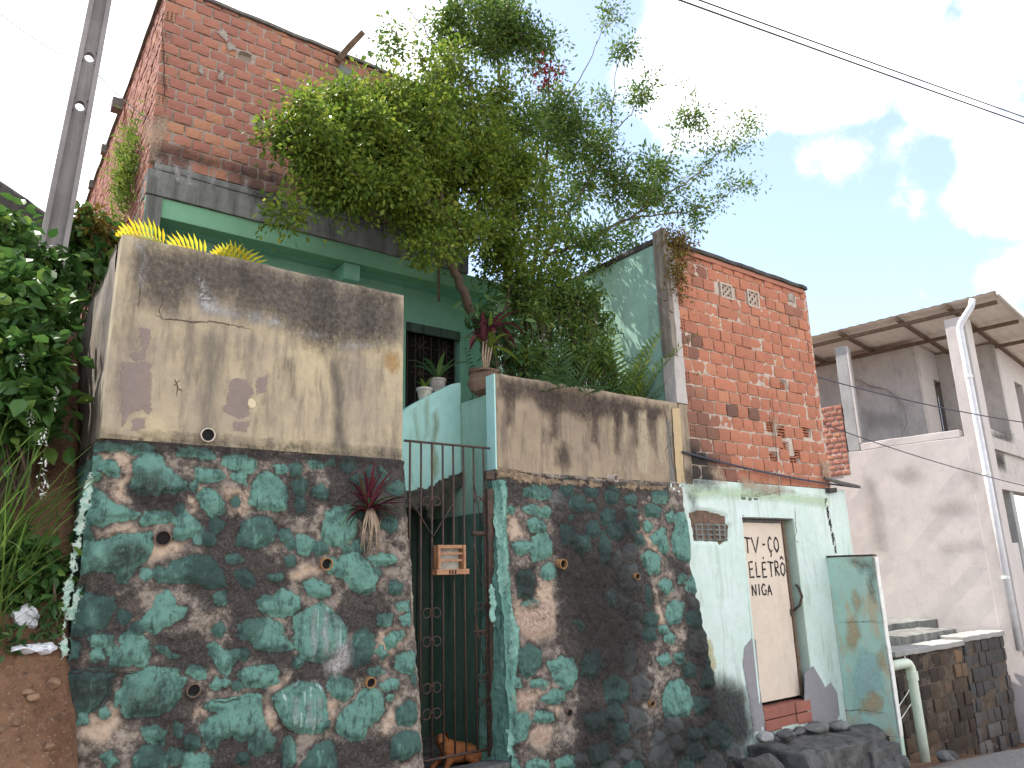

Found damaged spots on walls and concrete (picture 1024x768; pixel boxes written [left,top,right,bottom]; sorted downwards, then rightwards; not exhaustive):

crack [138,243,250,329]
water stain [137,246,397,343]
peeling [120,328,152,430]
peeling [224,376,267,432]
water stain [501,378,674,481]
flaking render [689,510,728,545]